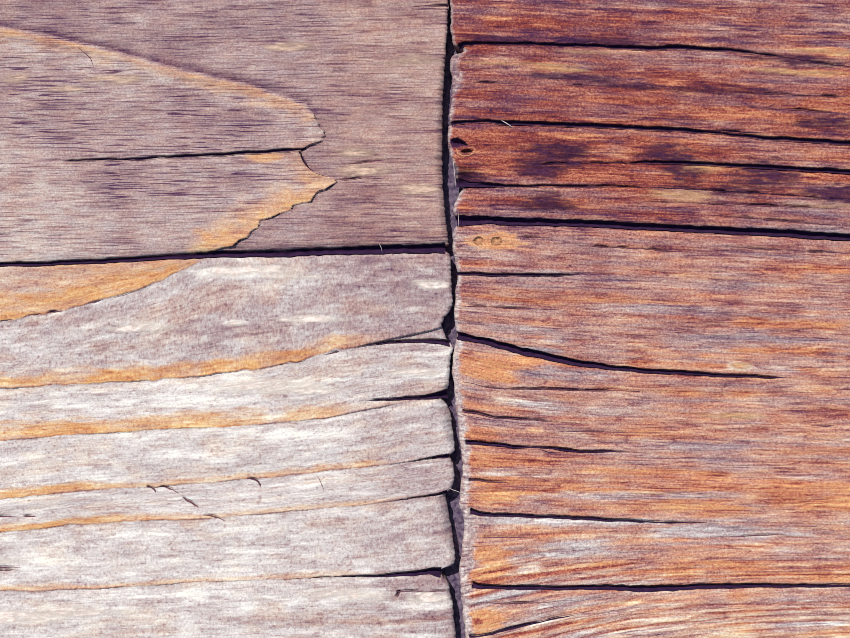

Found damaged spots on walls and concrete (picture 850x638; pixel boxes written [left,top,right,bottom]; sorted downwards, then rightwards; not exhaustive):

crack [736,92,847,113]
crack [452,120,850,145]
crack [63,147,313,171]
crack [337,160,376,180]
crack [546,161,850,174]
crack [456,180,850,254]
crack [0,243,446,266]
crack [457,270,577,278]
crack [457,333,781,392]